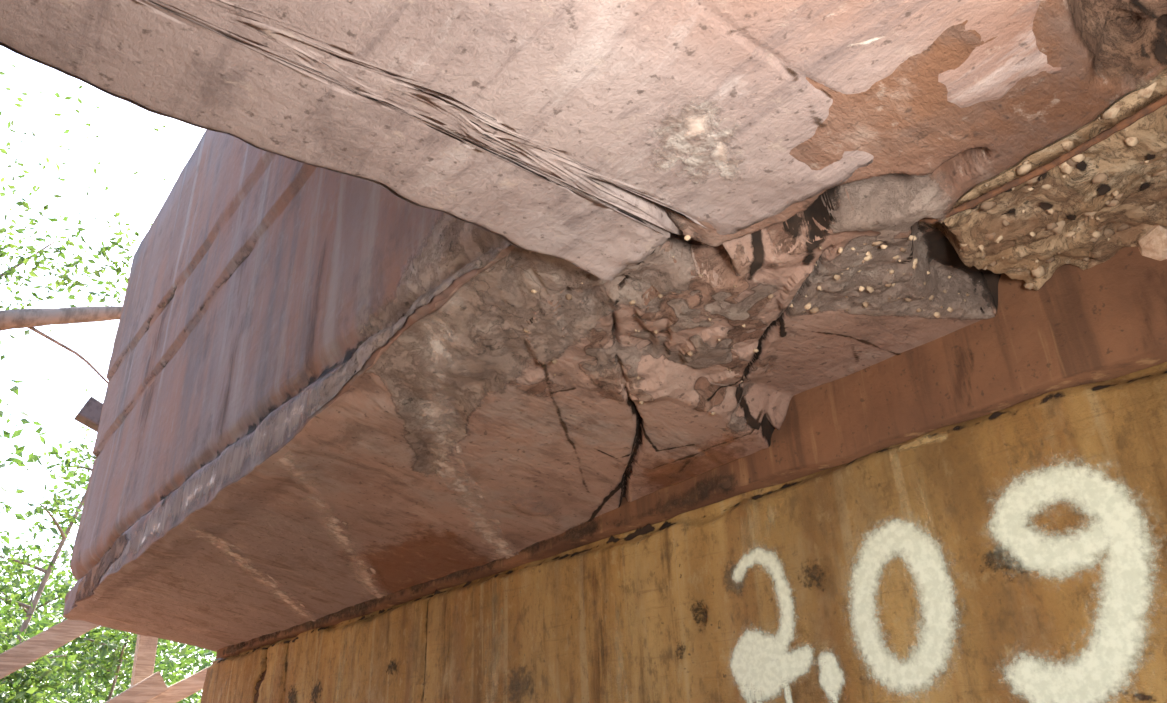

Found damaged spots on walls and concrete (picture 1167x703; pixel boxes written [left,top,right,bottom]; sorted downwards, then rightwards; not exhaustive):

spalling [579,0,1167,434]
spalling [472,254,585,354]
spalling [508,354,563,397]
crack [538,186,839,522]
crack [818,332,900,360]
spalling [878,426,963,452]
spalling [539,521,676,565]
crack [254,657,267,703]